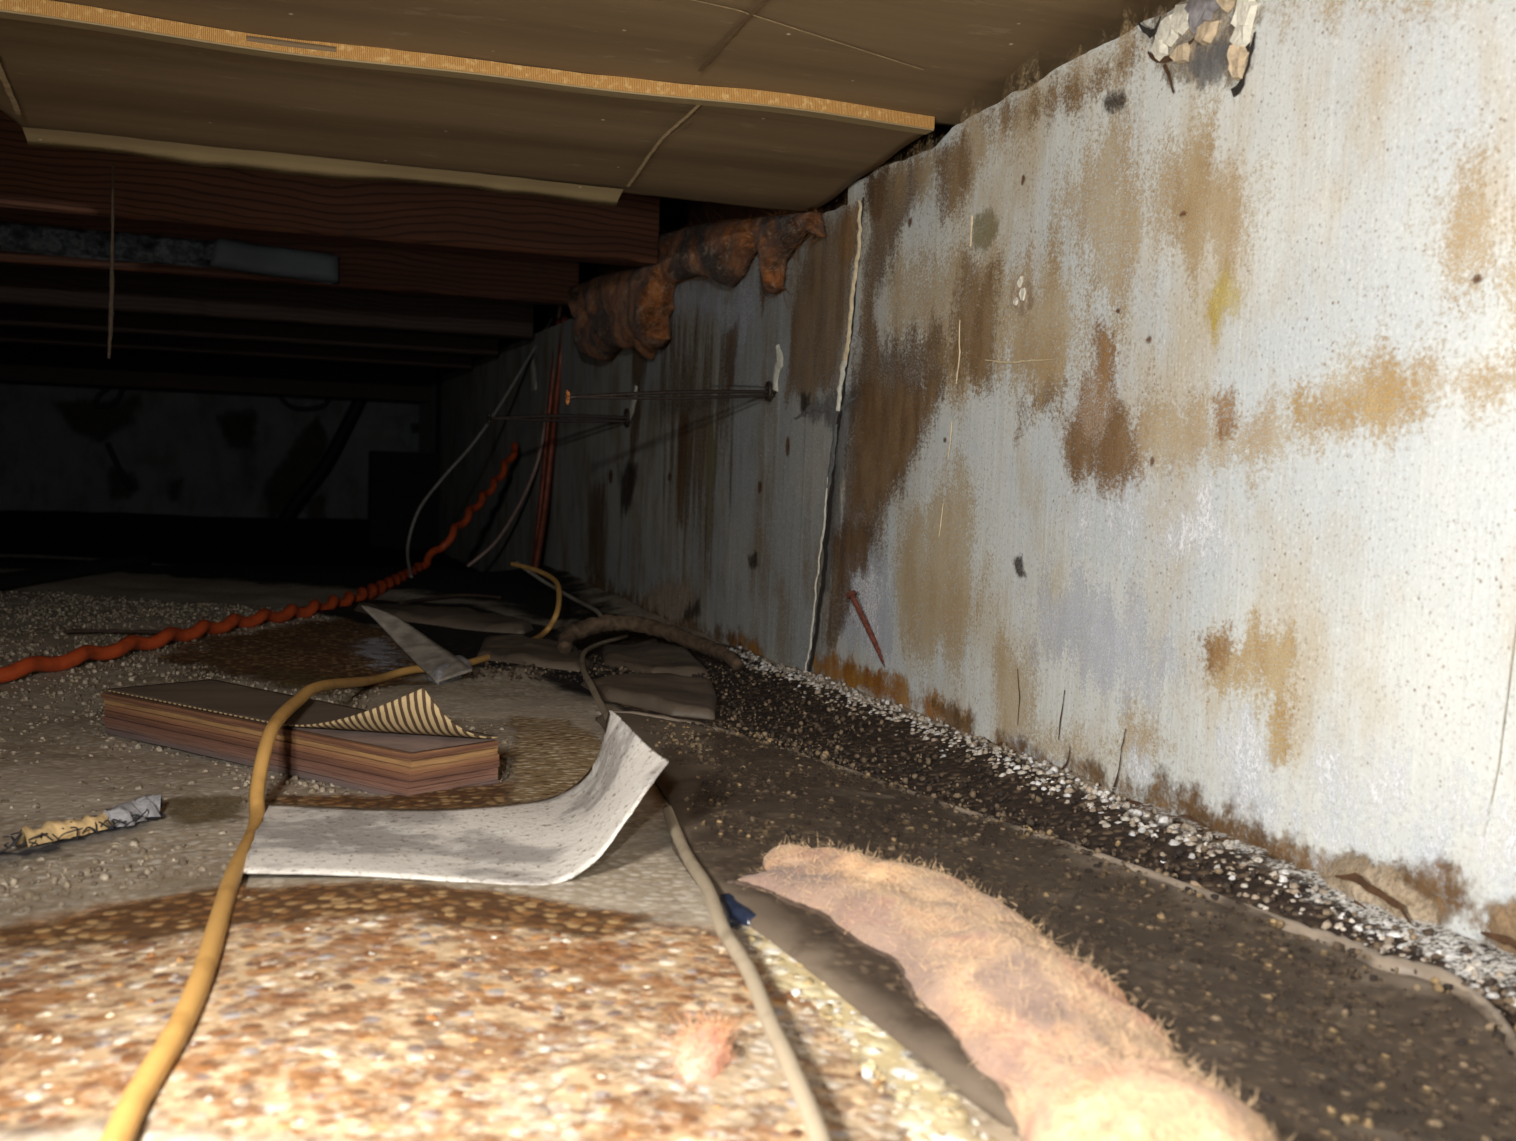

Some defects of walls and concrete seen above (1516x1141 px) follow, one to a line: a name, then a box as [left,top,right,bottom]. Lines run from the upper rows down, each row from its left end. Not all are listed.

water stain [586,269,768,643]
crack [794,197,864,672]
water stain [771,24,1259,673]
spalling [1137,0,1262,97]
water stain [1444,145,1516,321]
water stain [955,709,974,736]
water stain [993,346,1516,995]
crack [1483,628,1516,838]